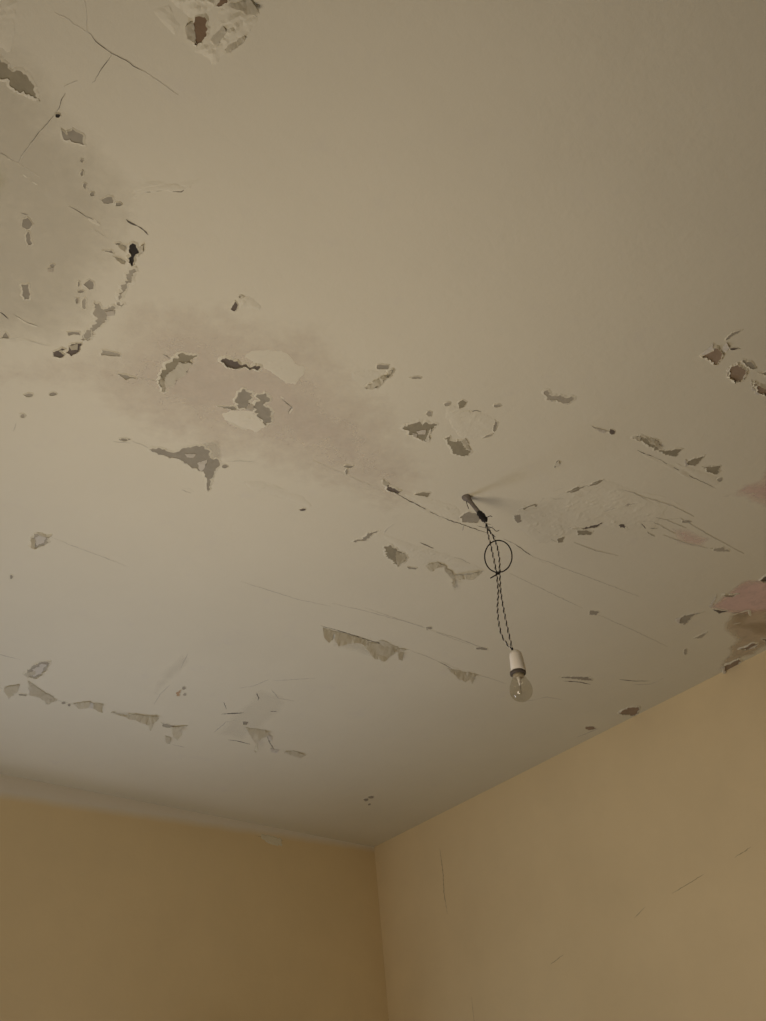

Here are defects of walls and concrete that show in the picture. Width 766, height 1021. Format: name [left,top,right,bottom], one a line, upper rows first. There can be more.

peeling [0,0,40,102]
crack [19,0,179,163]
peeling [151,0,260,66]
crack [126,219,149,235]
peeling [0,240,144,358]
peeling [699,329,766,396]
peeling [113,437,255,492]
peeling [399,419,439,443]
peeling [443,435,473,457]
crack [503,538,666,646]
peeling [321,625,506,684]
peeling [4,660,187,747]